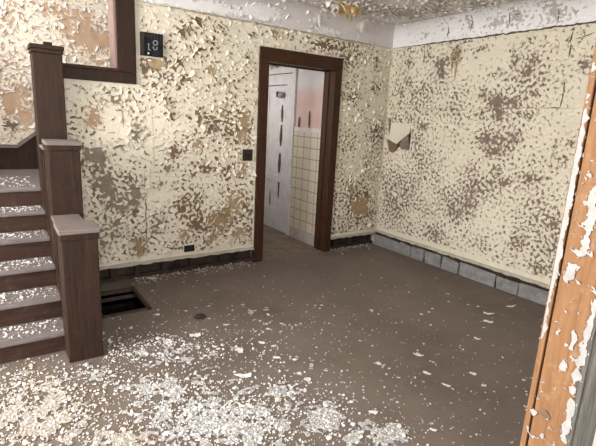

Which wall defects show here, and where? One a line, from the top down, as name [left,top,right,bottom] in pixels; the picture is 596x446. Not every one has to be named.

peeling [0,0,110,144]
peeling [64,0,596,339]